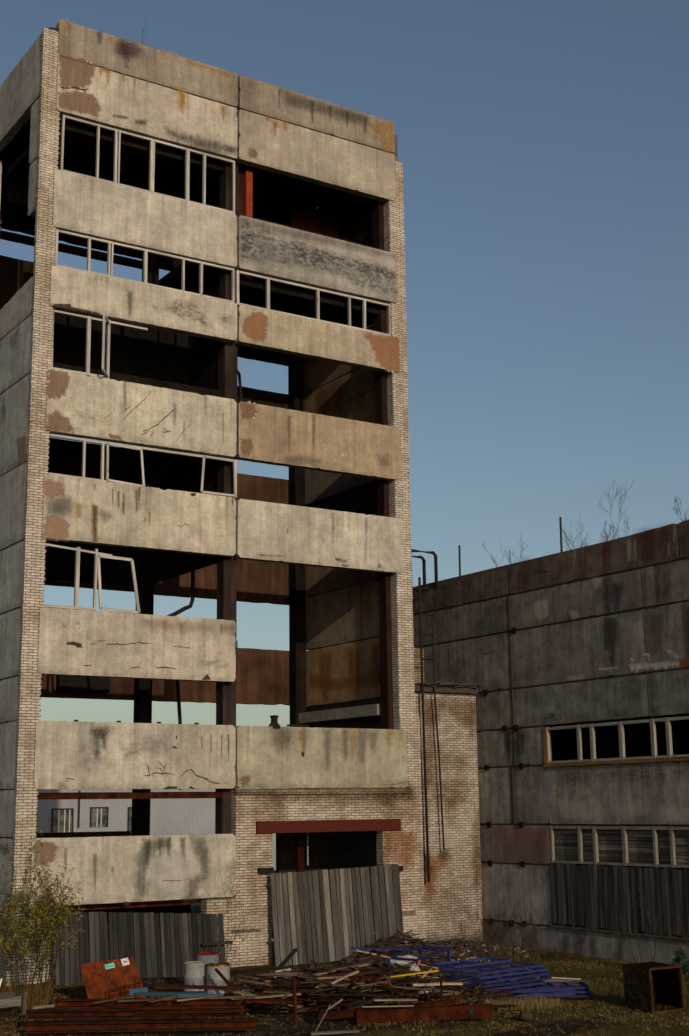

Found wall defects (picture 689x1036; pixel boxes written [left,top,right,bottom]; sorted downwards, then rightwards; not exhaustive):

peeling [58,55,101,117]
leakage [241,228,395,292]
peeling [242,312,269,342]
peeling [364,333,401,373]
peeling [46,369,73,433]
crack [104,391,192,441]
peeling [43,477,65,498]
peeling [42,515,70,541]
crack [143,736,220,784]
peeling [33,839,57,867]
leakage [138,839,183,891]